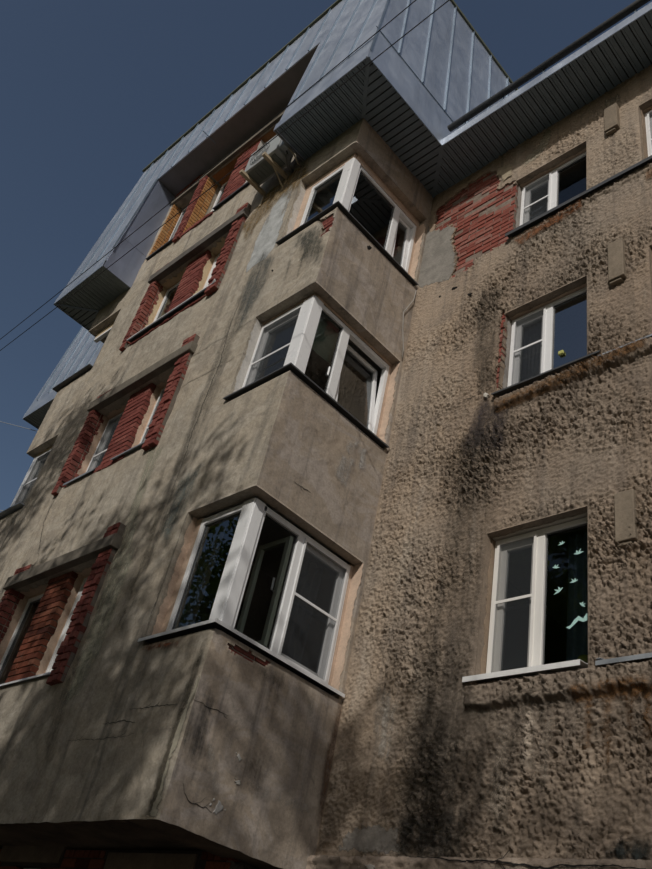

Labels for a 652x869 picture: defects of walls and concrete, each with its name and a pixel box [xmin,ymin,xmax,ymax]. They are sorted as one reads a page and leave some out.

leakage [300,230,320,260]
flaking render [436,163,519,278]
leakage [235,254,271,325]
crack [408,850,646,869]